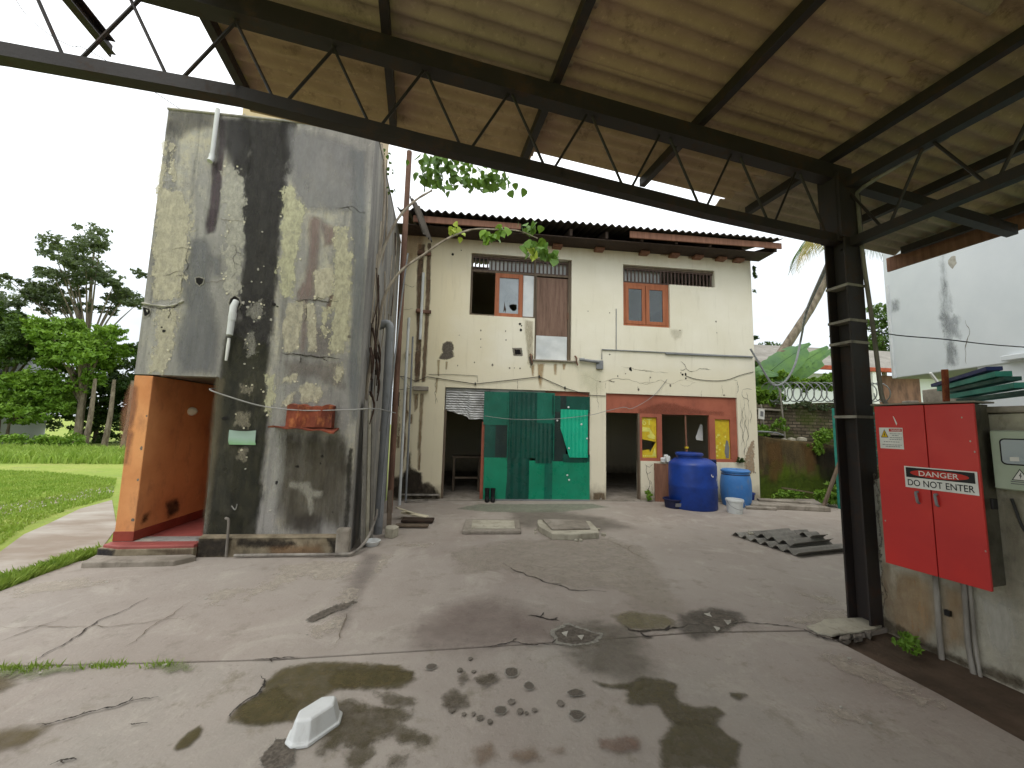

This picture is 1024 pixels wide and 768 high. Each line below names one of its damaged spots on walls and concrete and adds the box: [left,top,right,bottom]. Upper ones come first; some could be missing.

peeling [142,140,195,375]
peeling [220,161,355,417]
rust [298,217,335,304]
leakage [158,112,364,557]
peeling [235,412,251,429]
crack [503,563,606,592]
crack [2,598,185,661]
crack [39,696,158,726]